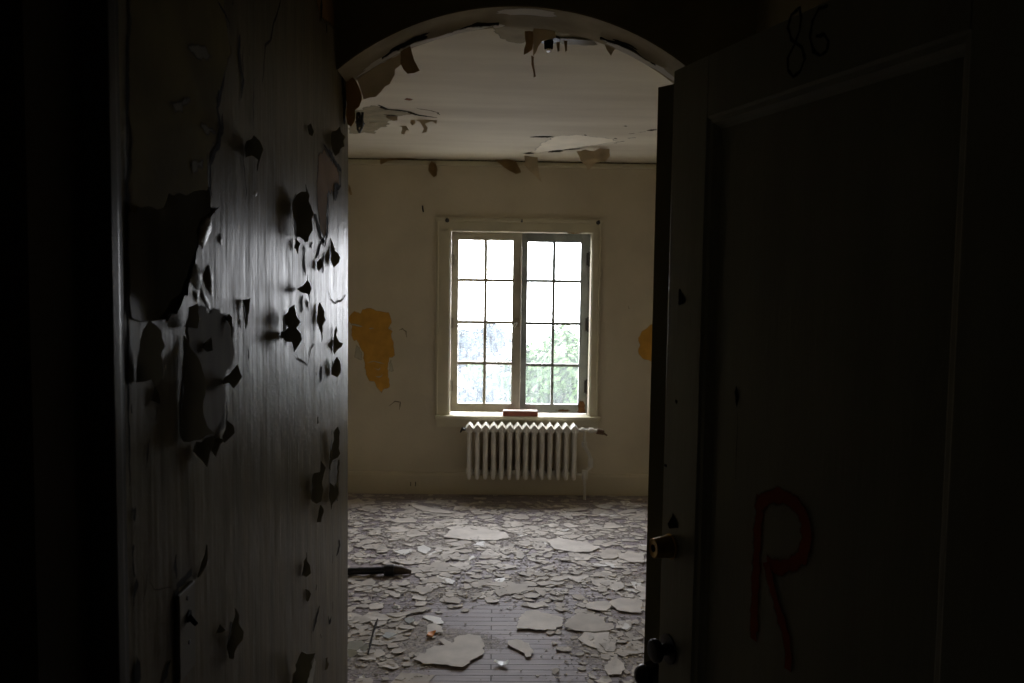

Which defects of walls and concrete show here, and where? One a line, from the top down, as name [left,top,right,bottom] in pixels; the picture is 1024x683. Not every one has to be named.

peeling [245,136,263,170]
peeling [292,9,674,393]
peeling [128,188,250,467]
peeling [280,305,302,351]
peeling [216,609,244,660]
peeling [291,652,329,683]